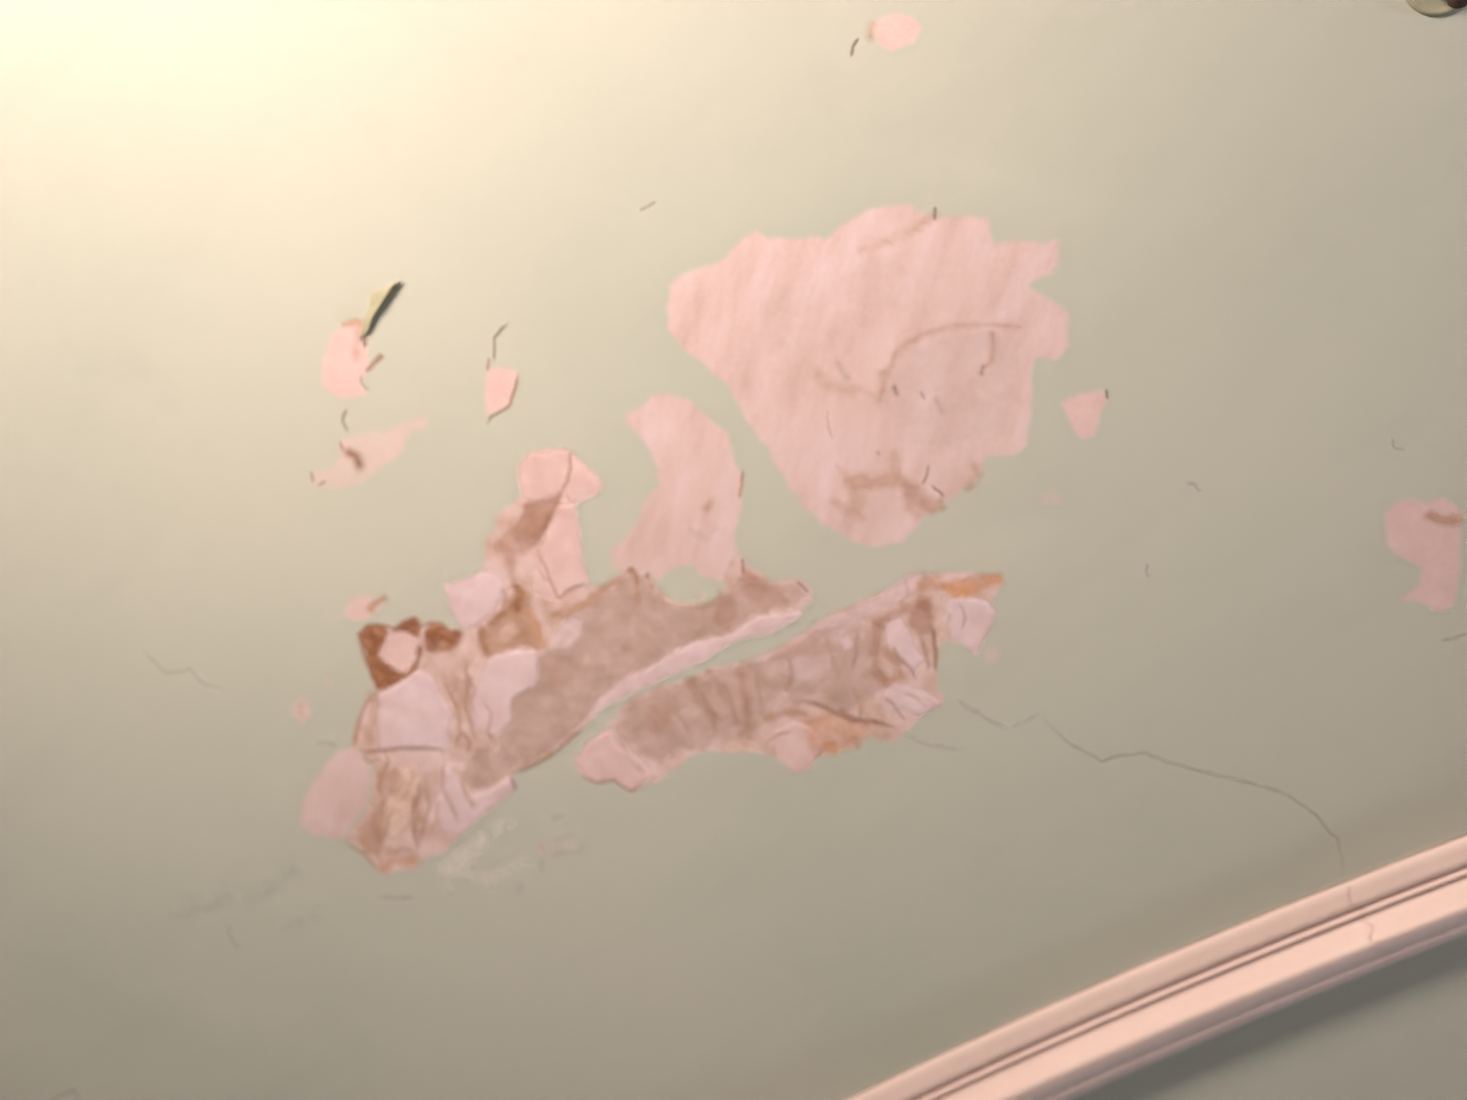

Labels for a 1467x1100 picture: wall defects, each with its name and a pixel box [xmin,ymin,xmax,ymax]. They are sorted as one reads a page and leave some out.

peeling [851,10,926,56]
peeling [1057,385,1110,442]
peeling [297,200,1074,879]
peeling [1380,492,1467,615]
crack [961,702,1340,849]